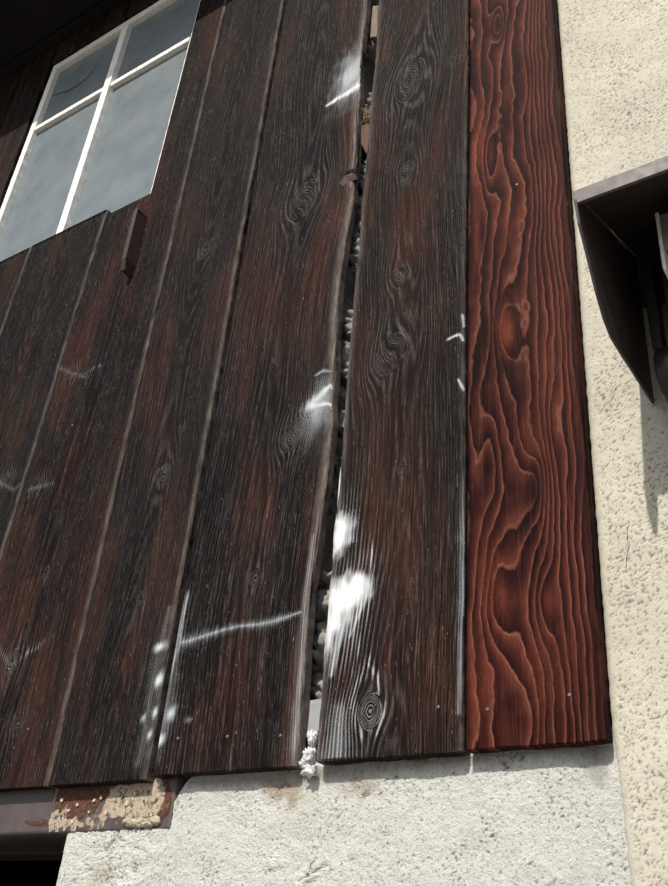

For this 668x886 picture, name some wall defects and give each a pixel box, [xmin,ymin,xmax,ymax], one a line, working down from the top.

corrosion [25,785,111,826]
peeling [48,780,165,832]
corrosion [145,780,172,821]